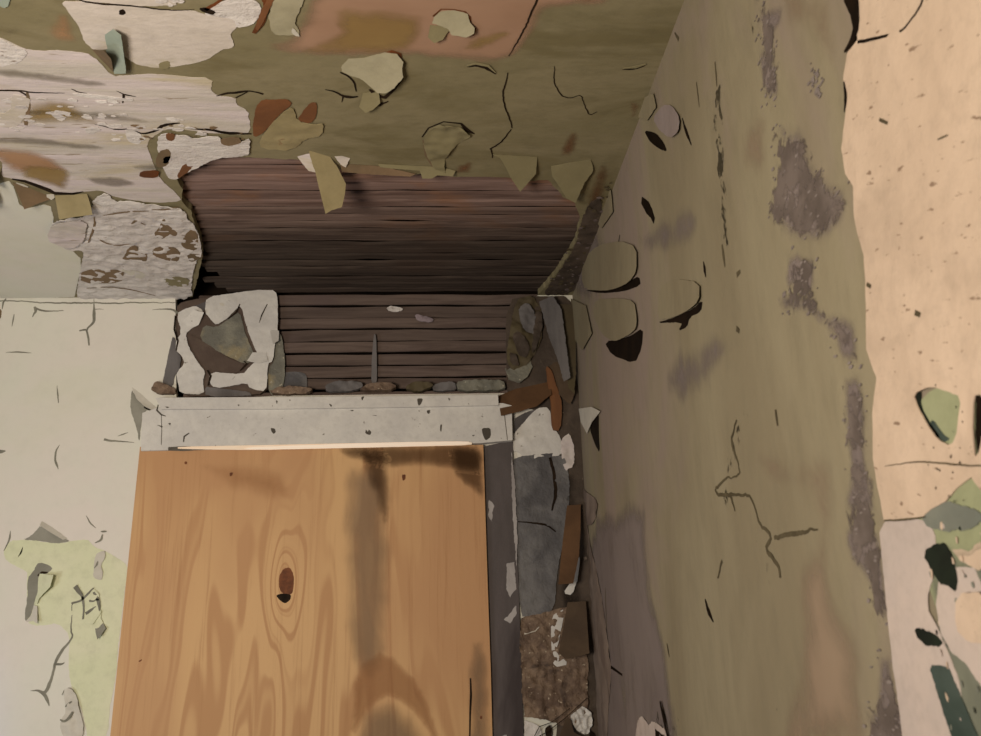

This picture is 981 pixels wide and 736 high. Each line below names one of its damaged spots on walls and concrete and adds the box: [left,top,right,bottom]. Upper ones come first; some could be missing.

peeling [0,0,537,327]
crack [490,0,538,158]
crack [553,66,596,115]
spalling [247,159,643,414]
peeling [658,279,702,330]
peeling [768,0,981,625]
flaking render [512,361,600,471]
crack [715,420,818,578]
peeling [25,563,53,623]
peeling [583,488,673,736]
peeling [929,526,981,692]
peeling [862,649,902,736]